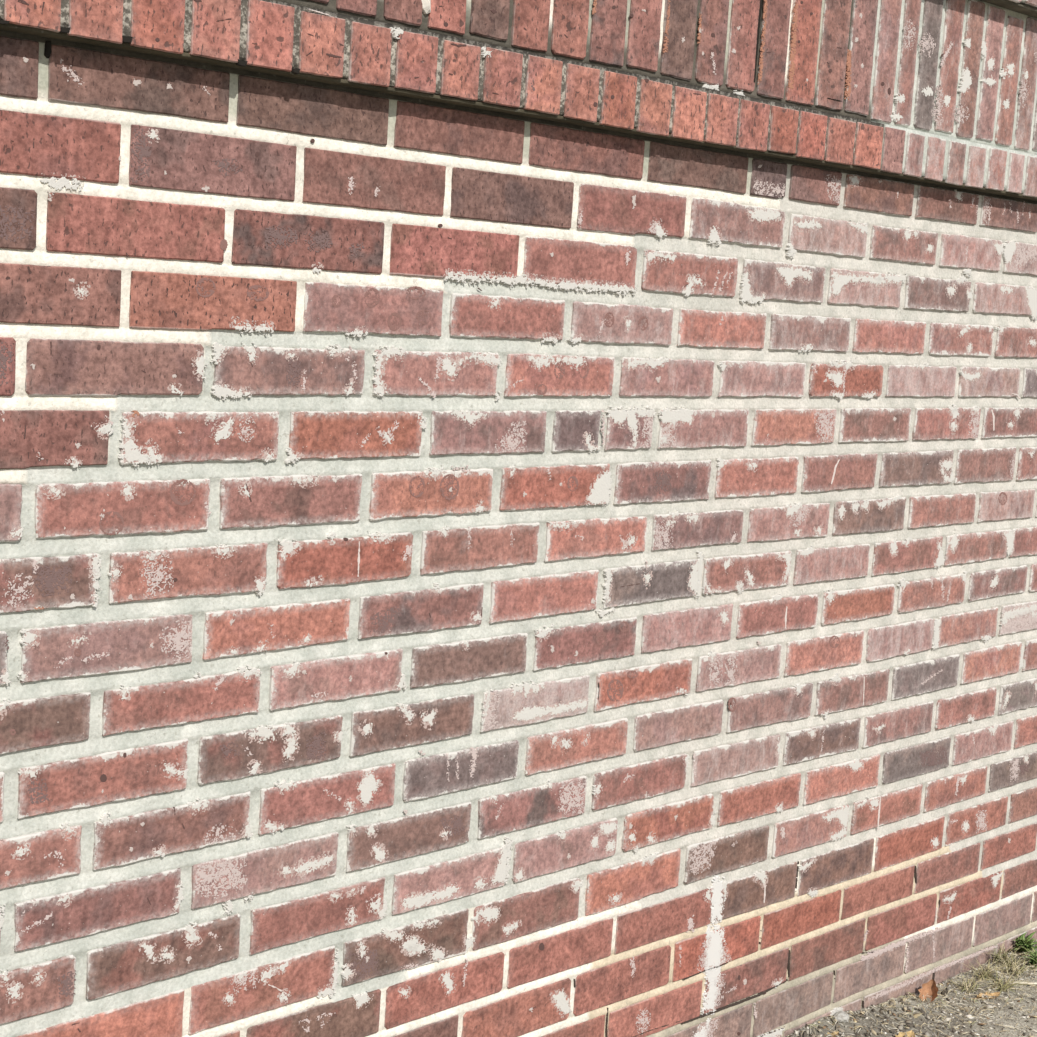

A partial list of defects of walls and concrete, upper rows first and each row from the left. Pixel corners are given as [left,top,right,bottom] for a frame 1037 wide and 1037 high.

water stain [446,747,479,782]
water stain [349,950,380,981]
water stain [686,875,737,1037]